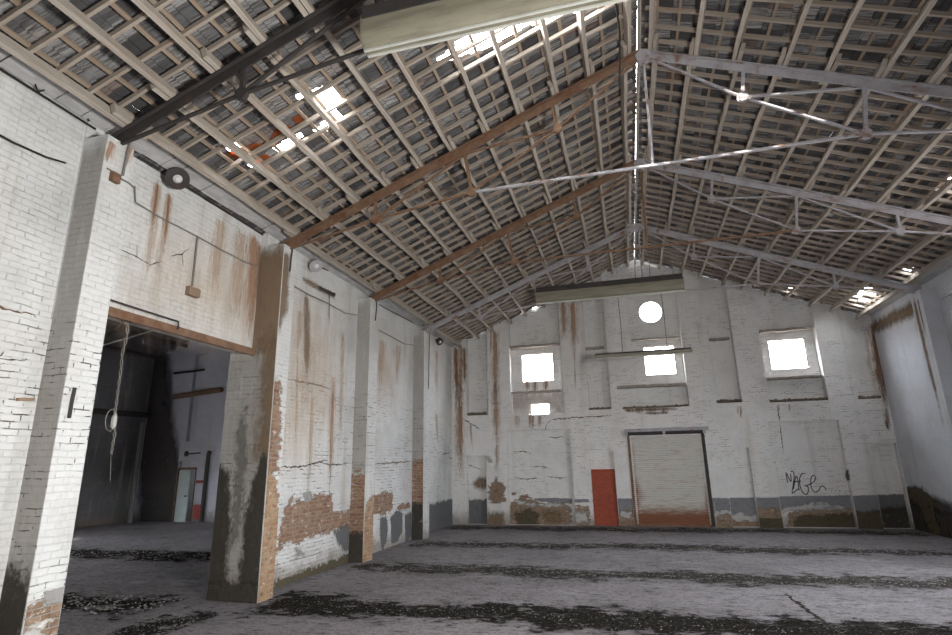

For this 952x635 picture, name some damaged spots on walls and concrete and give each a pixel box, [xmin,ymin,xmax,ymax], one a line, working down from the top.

crack [0,305,36,318]
rust [248,237,261,322]
flaking render [279,253,289,328]
rust [454,348,466,461]
spalling [206,380,350,604]
flaking render [363,490,410,563]
flaking render [487,477,591,526]
leakage [932,498,952,516]
flaking render [23,587,64,635]